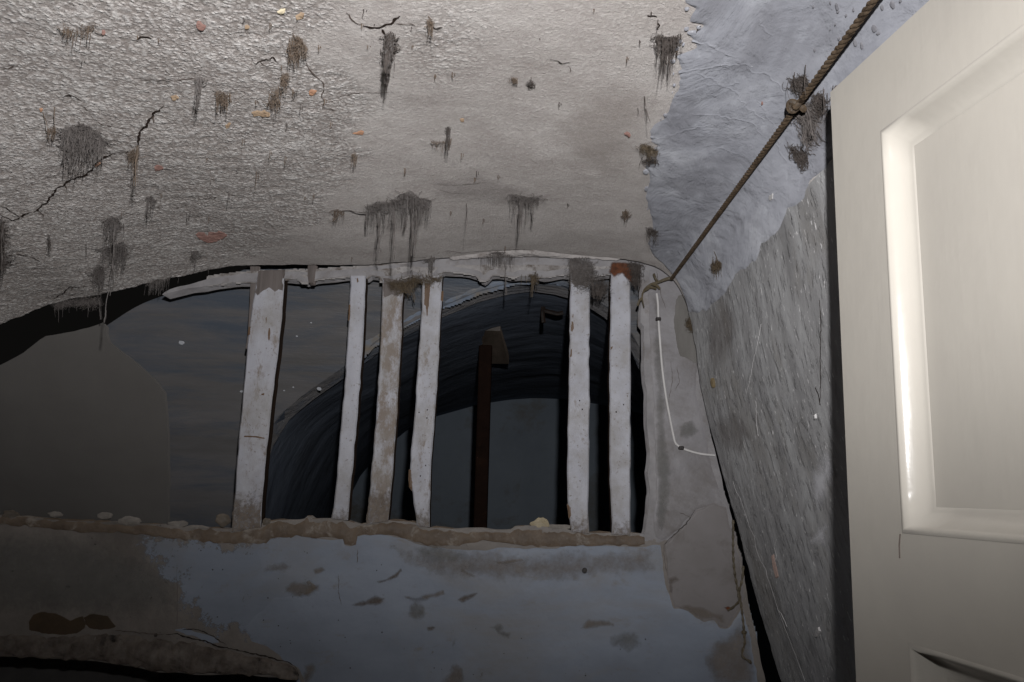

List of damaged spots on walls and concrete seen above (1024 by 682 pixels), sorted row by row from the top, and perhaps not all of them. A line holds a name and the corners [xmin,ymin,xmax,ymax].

crack [346,12,443,36]
crack [0,95,163,221]
peeling [643,0,929,313]
corrosion [610,263,633,281]